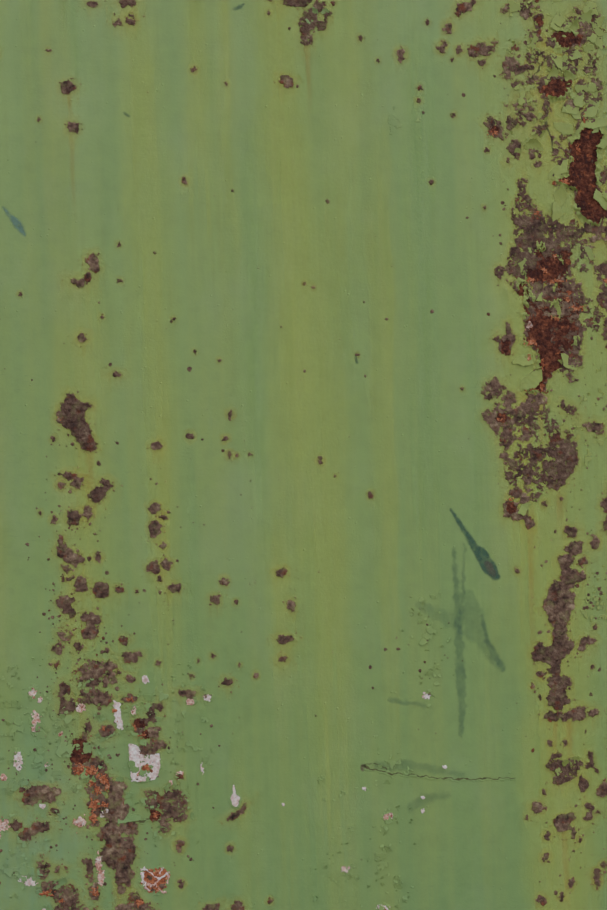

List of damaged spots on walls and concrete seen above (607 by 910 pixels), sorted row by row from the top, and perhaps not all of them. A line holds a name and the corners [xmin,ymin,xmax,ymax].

rust [283,0,335,46]
rust [435,0,498,69]
peeling [507,0,607,110]
rust [481,0,607,906]
peeling [13,747,25,771]
peeling [16,664,214,847]
peeling [228,785,243,810]
peeling [0,814,47,908]
peeling [93,850,105,886]
peeling [137,865,170,896]